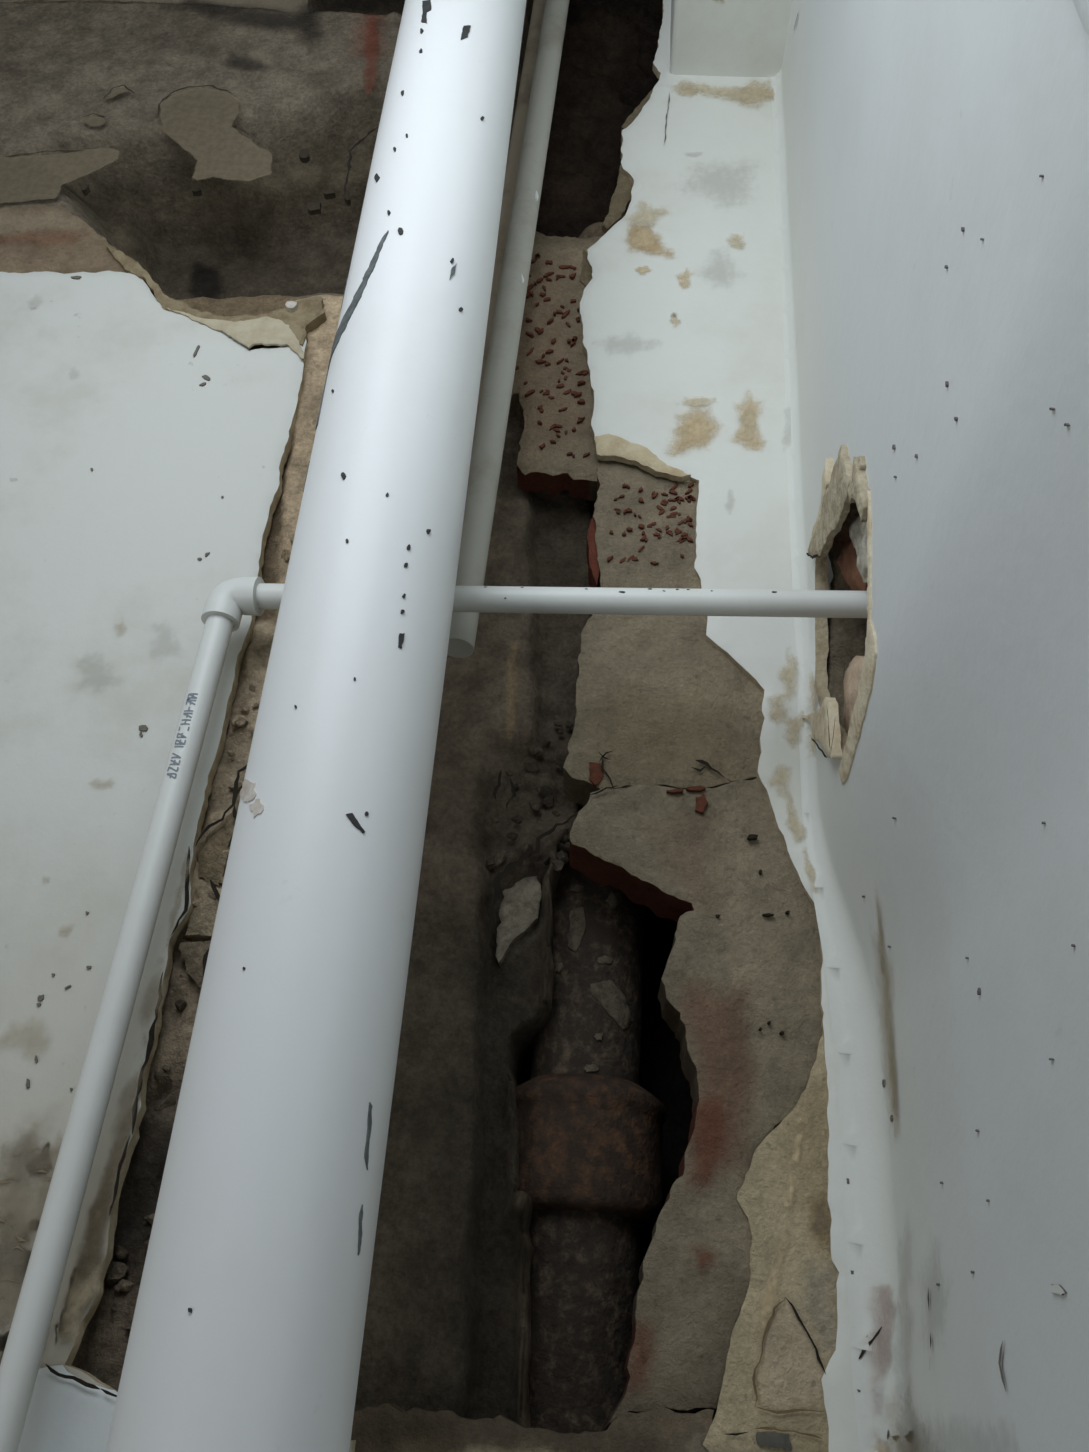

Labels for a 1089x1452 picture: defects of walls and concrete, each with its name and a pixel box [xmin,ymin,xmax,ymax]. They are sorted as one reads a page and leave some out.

peeling [157,85,272,181]
peeling [419,0,432,53]
peeling [461,25,471,40]
peeling [0,148,348,360]
spalling [508,89,700,589]
spalling [801,445,877,784]
crack [171,848,190,935]
spalling [179,750,247,988]
crack [590,751,617,795]
crack [666,760,733,815]
crack [109,972,163,1216]
spalling [351,614,839,1452]